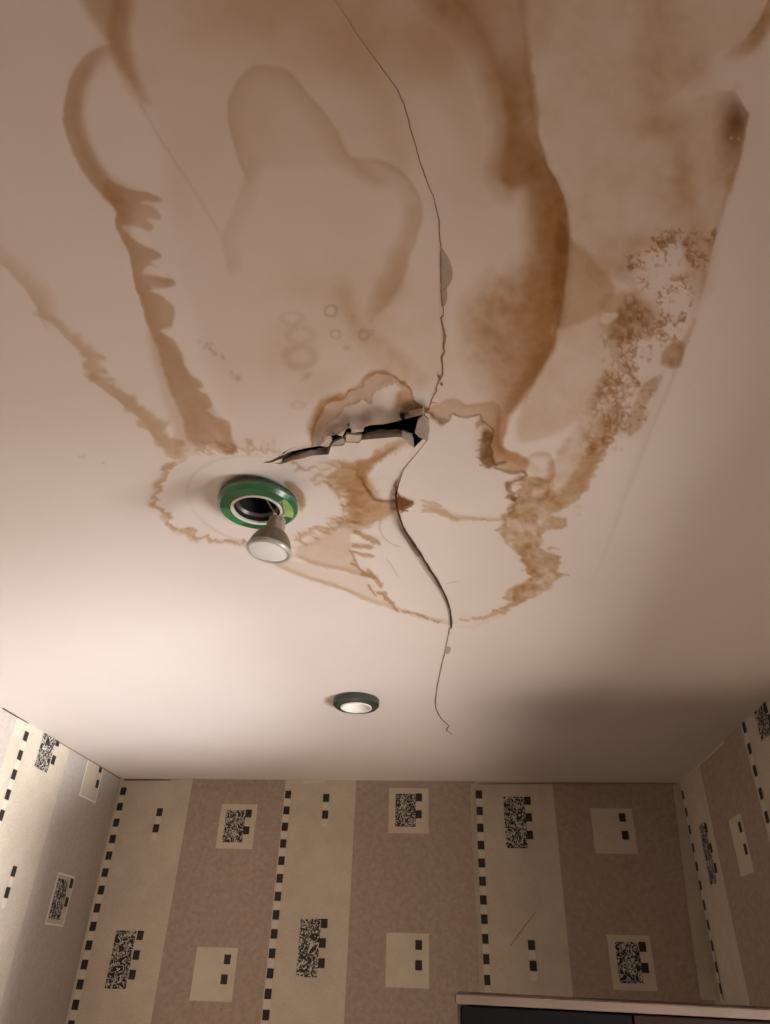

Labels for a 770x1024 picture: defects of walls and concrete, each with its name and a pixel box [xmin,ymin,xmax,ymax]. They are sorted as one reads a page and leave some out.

crack [335,0,441,248]
crack [264,307,447,464]
crack [380,473,458,734]